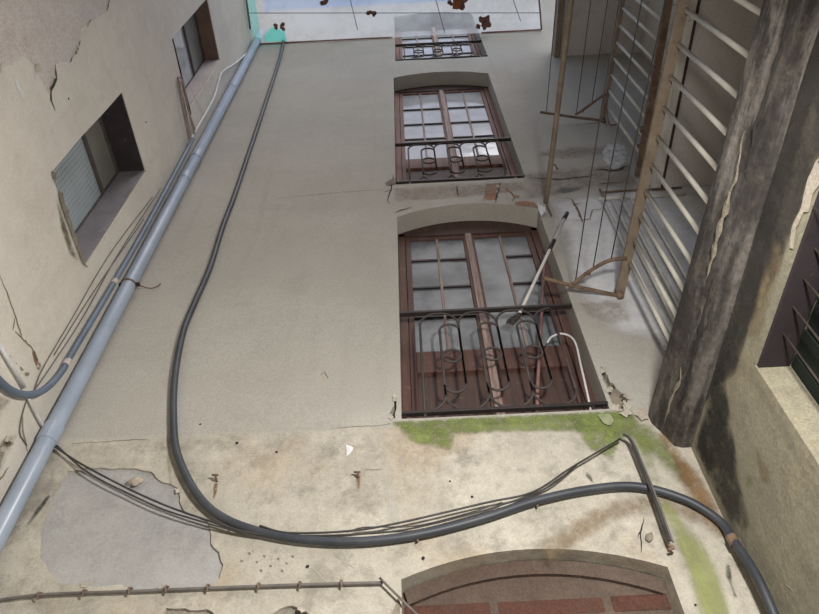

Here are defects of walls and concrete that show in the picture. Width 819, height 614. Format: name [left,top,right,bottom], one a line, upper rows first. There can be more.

peeling [0,0,107,92]
spalling [59,191,89,268]
crack [664,0,795,424]
crack [0,276,39,364]
water stain [698,30,819,525]
spalling [598,367,633,425]
peeling [41,466,223,590]